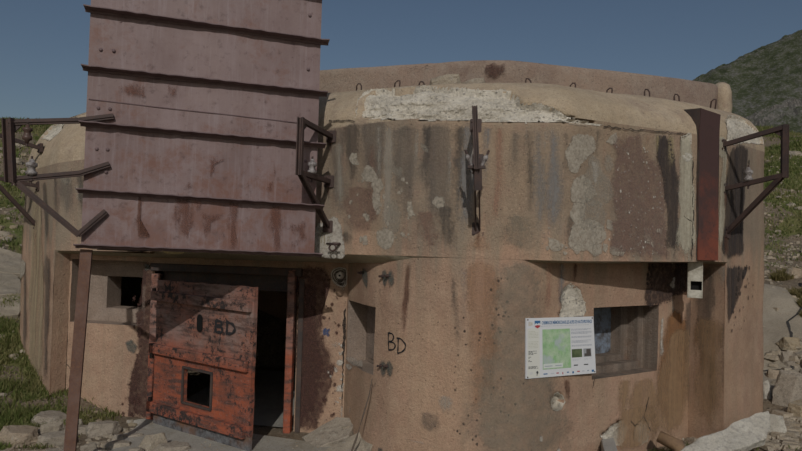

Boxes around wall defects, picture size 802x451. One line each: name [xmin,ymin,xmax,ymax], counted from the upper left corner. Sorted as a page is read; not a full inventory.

rust [136,198,149,237]
damp [296,267,340,429]
damp [315,217,346,258]
damp [449,127,474,218]
spalling [349,85,626,256]
spalling [559,283,586,317]
damp [645,135,696,312]
damp [617,298,724,448]
damp [719,137,750,330]